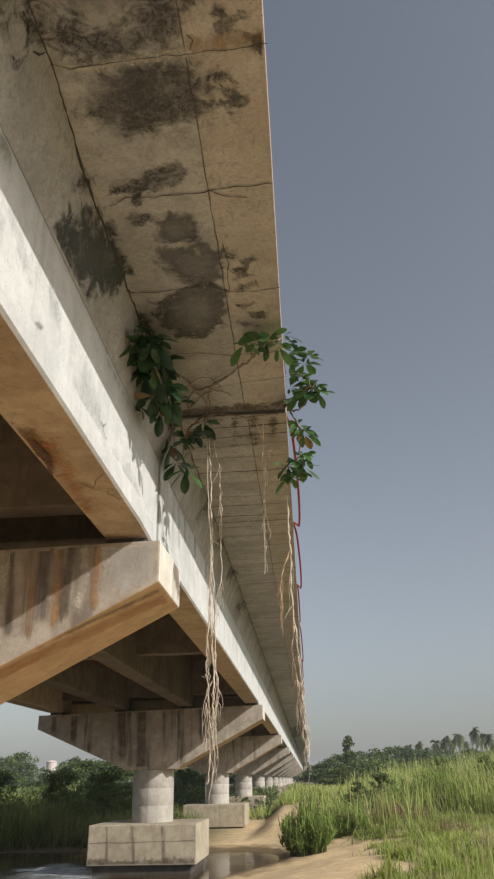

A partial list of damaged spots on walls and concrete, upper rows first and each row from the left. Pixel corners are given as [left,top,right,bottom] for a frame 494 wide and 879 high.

damp [14,0,249,132]
crack [27,0,280,326]
damp [54,203,134,300]
damp [111,165,256,339]